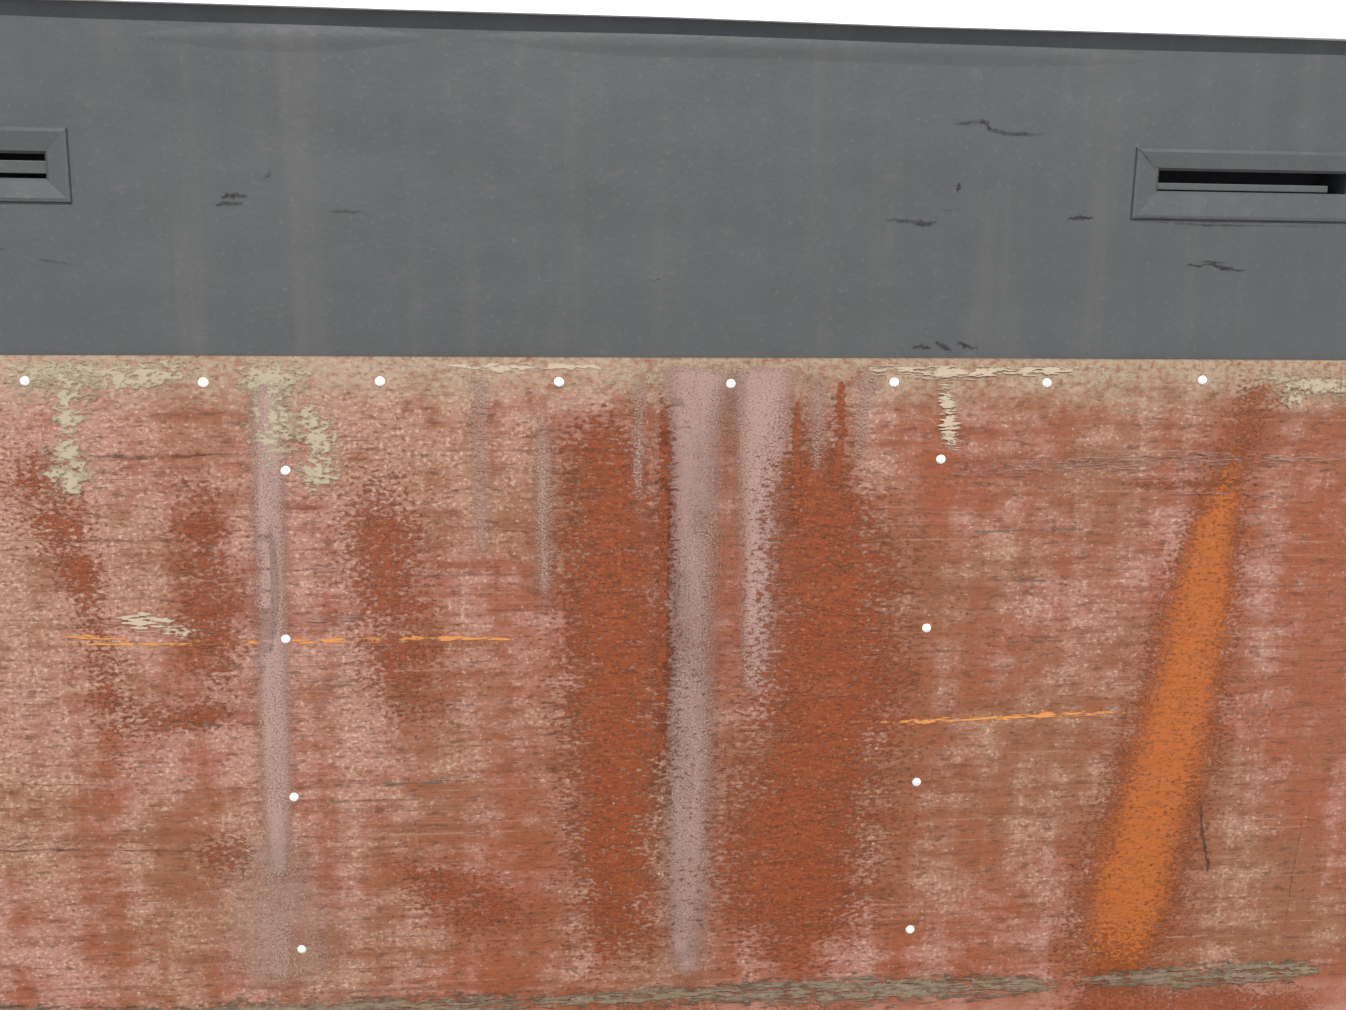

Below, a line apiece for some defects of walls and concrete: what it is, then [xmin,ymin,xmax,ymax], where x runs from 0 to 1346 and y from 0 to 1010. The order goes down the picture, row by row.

damp [525,404,562,612]
damp [620,363,833,986]
corrosion [393,379,1322,1010]